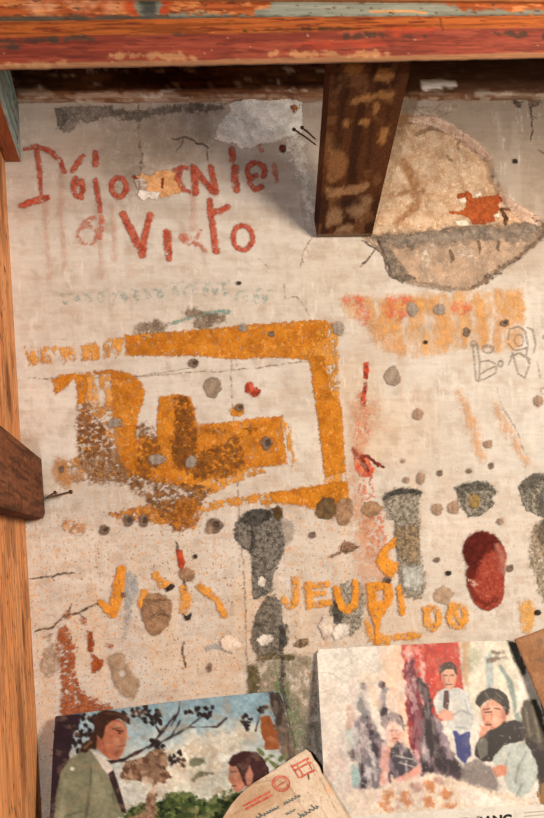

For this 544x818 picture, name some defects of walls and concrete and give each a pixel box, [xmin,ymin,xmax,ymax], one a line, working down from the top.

spalling [363,101,544,292]